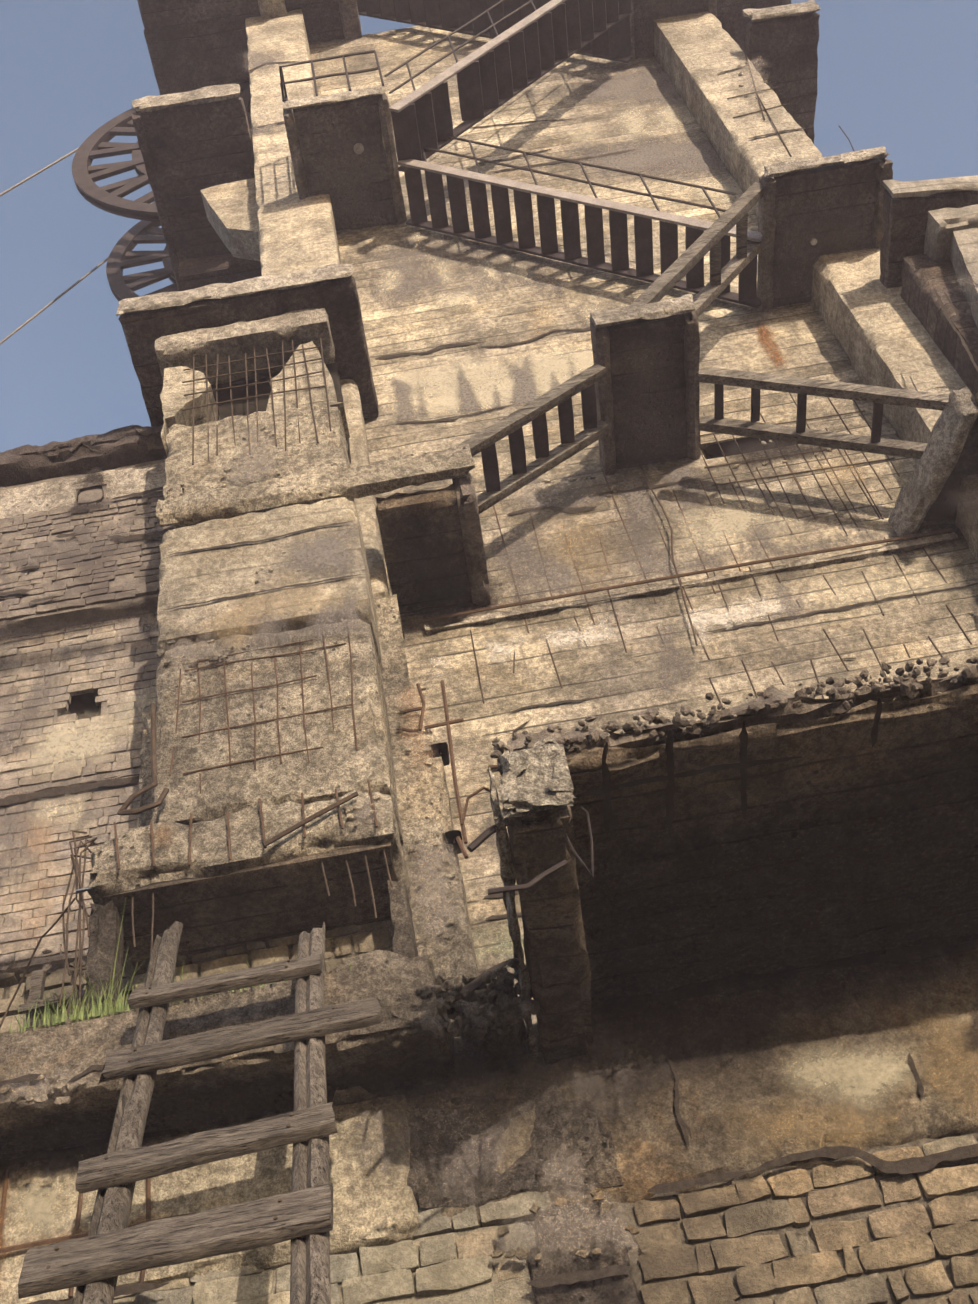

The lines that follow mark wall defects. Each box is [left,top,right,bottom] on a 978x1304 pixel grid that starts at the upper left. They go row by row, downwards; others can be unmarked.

corrosion [759,325,783,364]
spalling [182,338,331,488]
spalling [425,393,953,704]
crack [703,583,978,633]
spalling [113,623,358,870]
spalling [507,629,978,755]
spalling [259,780,382,849]
spalling [389,958,541,1054]
corrosion [0,1160,98,1304]
corrosion [116,1240,291,1287]
corrosion [128,1144,293,1225]
corrosion [329,1092,420,1256]